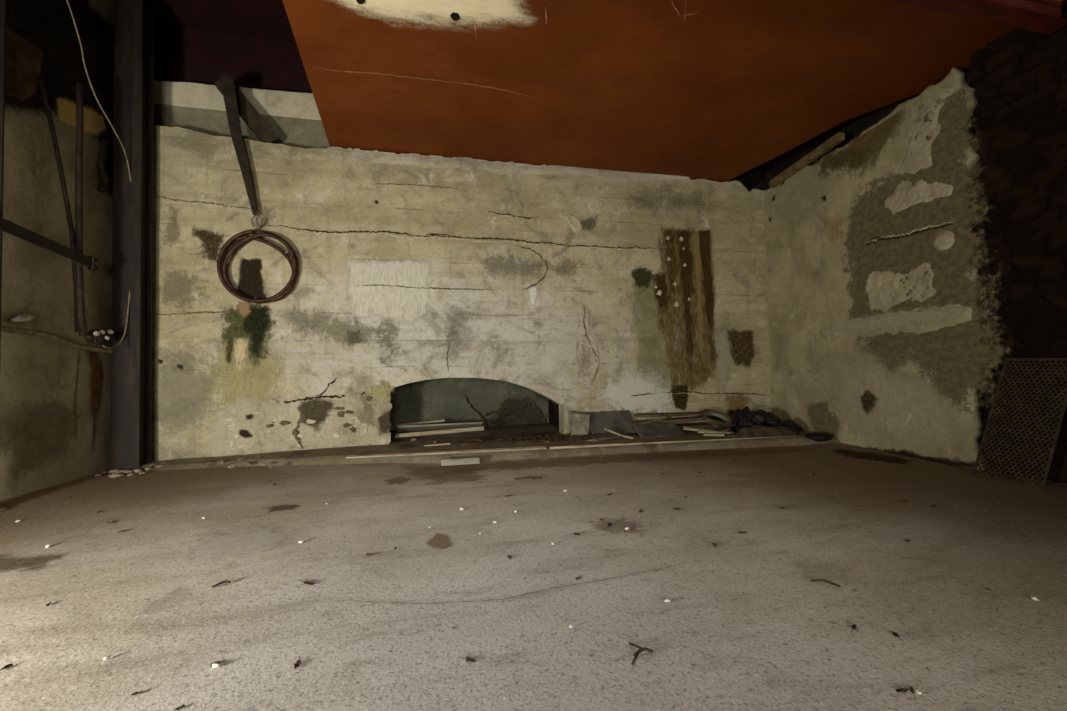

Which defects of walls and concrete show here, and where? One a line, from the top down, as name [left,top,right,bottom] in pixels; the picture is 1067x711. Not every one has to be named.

peeling [339,0,527,24]
peeling [885,96,953,214]
crack [153,196,661,291]
crack [866,221,954,245]
peeling [866,263,937,312]
damp [239,301,250,317]
damp [226,338,248,371]
damp [728,329,755,367]
crack [272,378,391,448]
spalling [860,390,876,413]